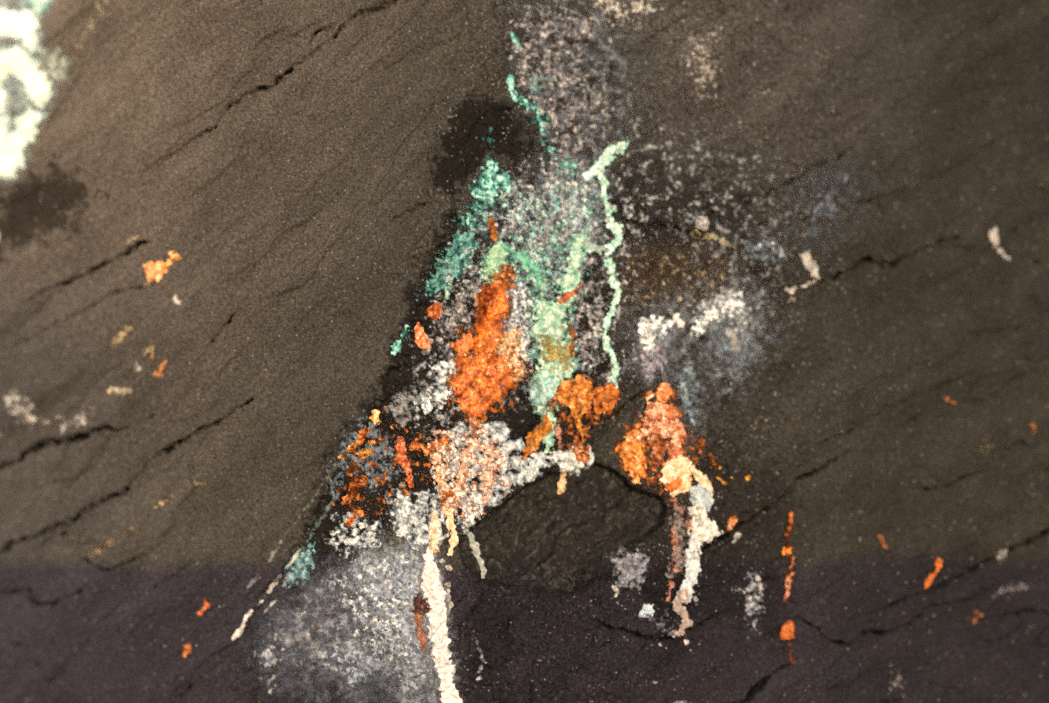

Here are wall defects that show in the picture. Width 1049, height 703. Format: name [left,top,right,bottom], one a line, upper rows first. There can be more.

crack [209,66,293,132]
crack [29,241,148,300]
corrosion [143,250,182,287]
crack [0,426,120,469]
crack [164,420,220,452]
corrosion [331,407,452,528]
crack [6,487,129,549]
crack [701,522,740,550]
corrosion [781,509,795,602]
corrosion [924,558,943,589]
corrosion [780,620,797,664]
crack [832,583,941,643]